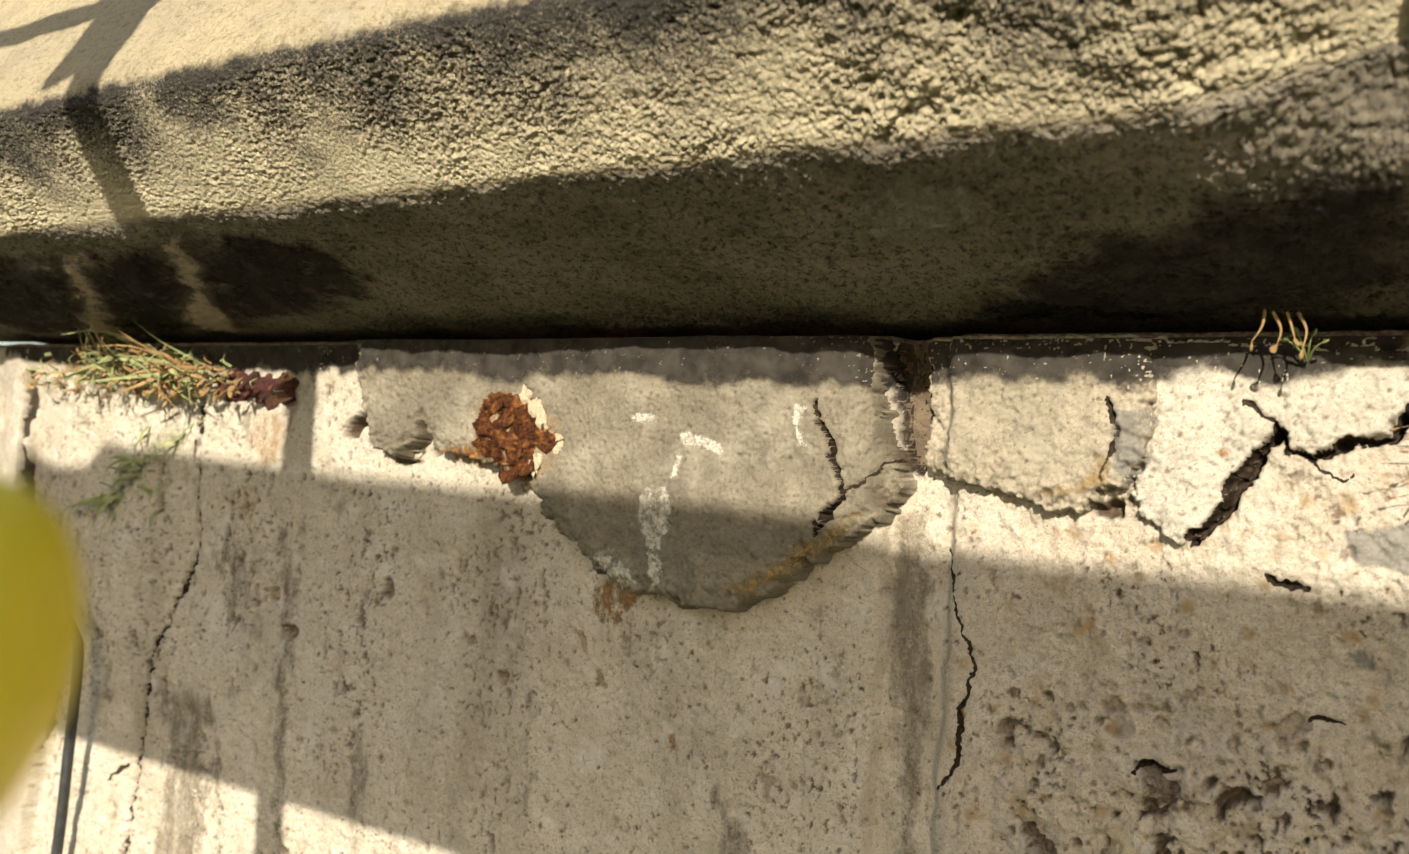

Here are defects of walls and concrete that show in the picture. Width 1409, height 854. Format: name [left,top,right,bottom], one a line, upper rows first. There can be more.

crack [20,371,40,489]
spalling [350,415,369,438]
spalling [395,450,443,464]
corrosion [444,447,485,468]
peeling [492,384,564,484]
crack [812,399,915,538]
crack [1098,396,1120,482]
crack [1184,399,1409,548]
crack [107,404,207,854]
crack [937,548,978,790]